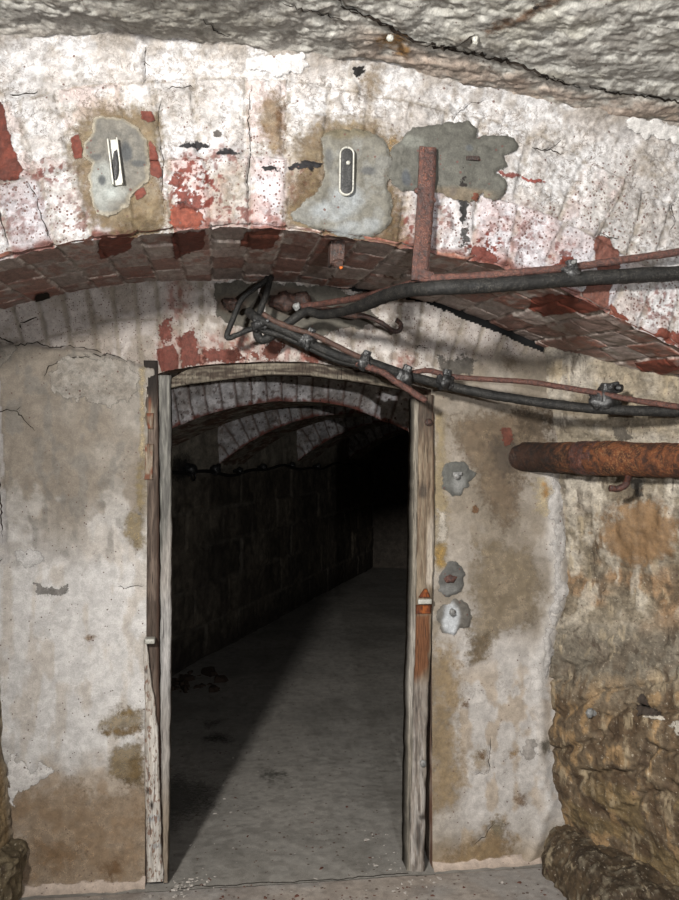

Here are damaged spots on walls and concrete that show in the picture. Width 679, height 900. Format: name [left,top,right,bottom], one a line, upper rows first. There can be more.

crack [283,0,679,104]
spalling [0,102,23,186]
spalling [71,134,82,159]
spalling [140,111,155,122]
peeling [469,245,500,264]
peeling [594,235,620,270]
crack [0,317,132,376]
peeling [654,327,679,345]
crack [0,483,8,561]
leakage [599,500,678,566]
flaking render [33,582,69,596]
leakage [11,709,145,887]